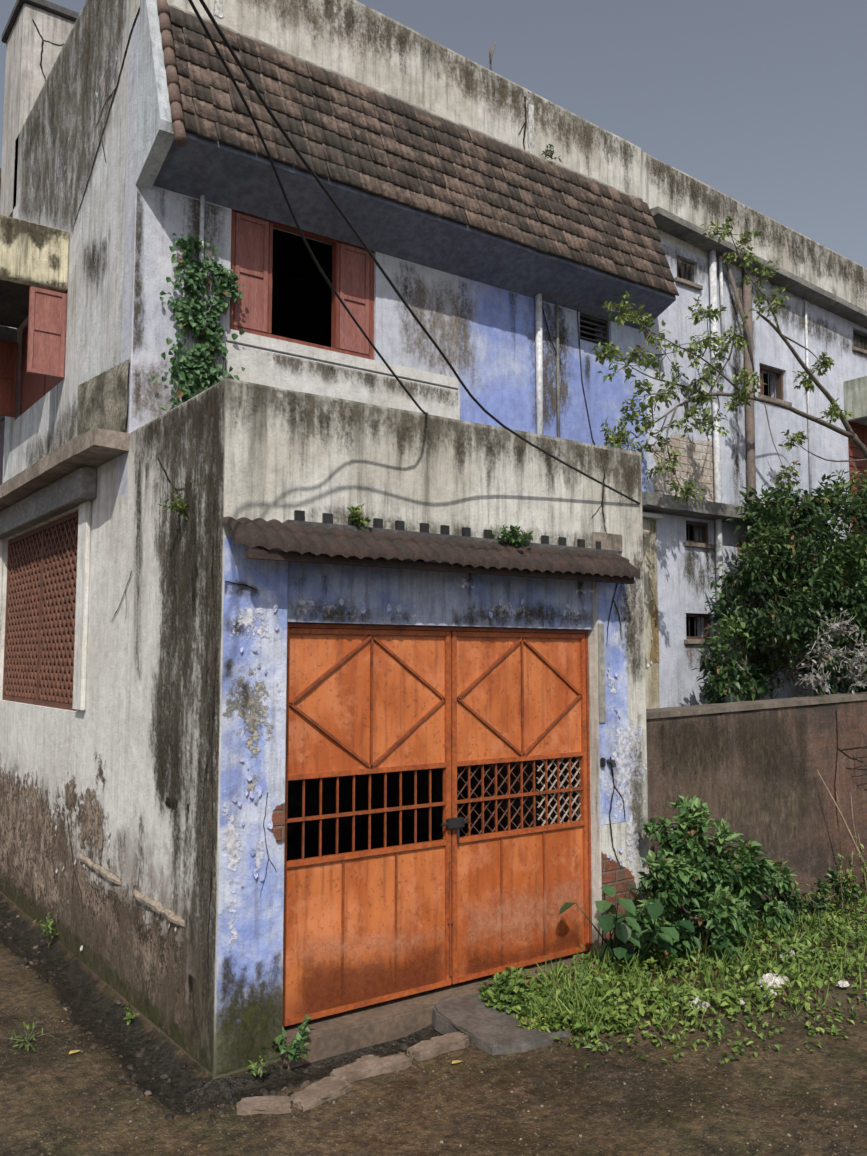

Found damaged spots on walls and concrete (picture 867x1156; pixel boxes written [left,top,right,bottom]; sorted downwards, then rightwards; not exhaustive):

crack [32,19,64,81]
leakage [648,157,866,294]
leakage [273,353,458,399]
leakage [404,266,472,366]
leakage [239,384,640,502]
leakage [530,303,570,424]
flaking render [653,434,723,502]
leakage [732,346,742,487]
leakage [664,245,867,355]
leakage [0,370,282,1074]
peeling [219,604,286,948]
flaking render [0,752,200,1051]